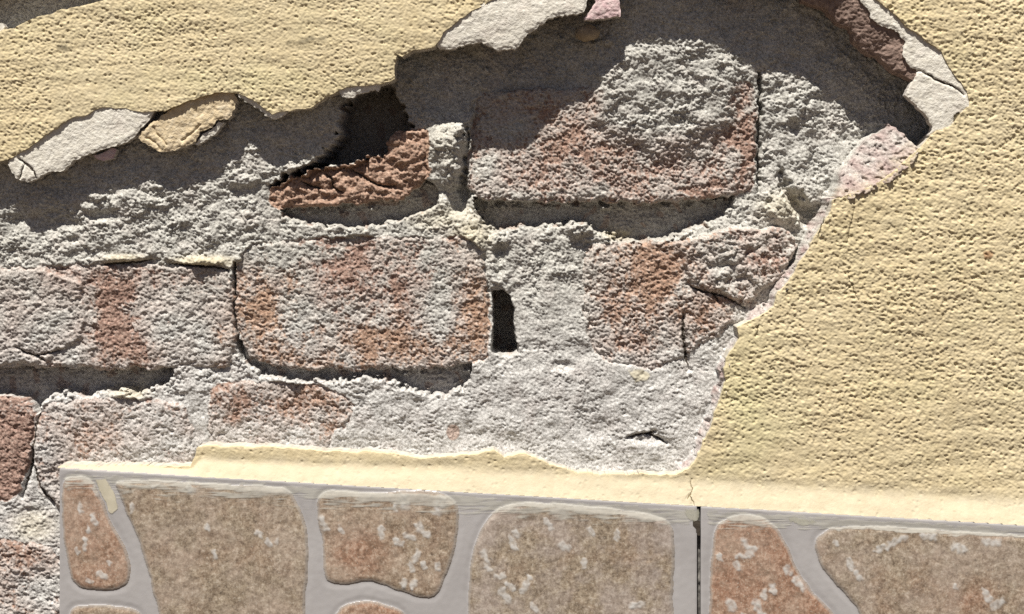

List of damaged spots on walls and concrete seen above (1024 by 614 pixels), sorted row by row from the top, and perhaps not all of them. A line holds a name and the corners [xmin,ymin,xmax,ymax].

spalling [437,0,621,52]
spalling [798,0,969,137]
spalling [8,92,288,182]
spalling [274,84,415,187]
spalling [747,124,918,326]
spalling [491,289,519,357]